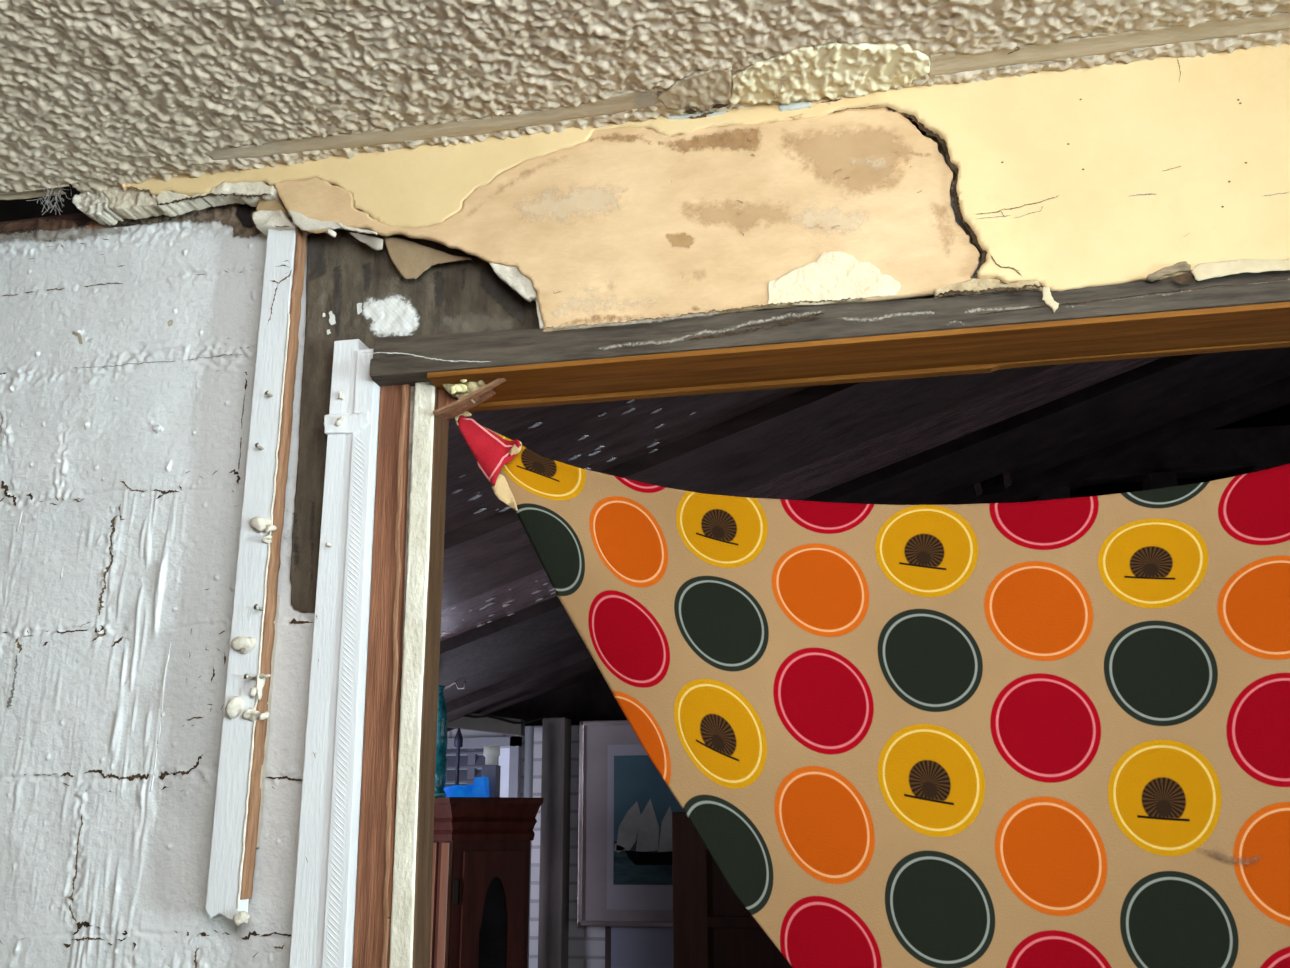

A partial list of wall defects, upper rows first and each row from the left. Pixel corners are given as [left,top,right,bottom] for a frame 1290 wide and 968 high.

crack [3,238,124,296]
crack [268,260,292,322]
flaking render [93,97,980,627]
crack [829,105,1059,297]
crack [0,347,249,739]
crack [24,754,292,968]
crack [266,776,303,788]